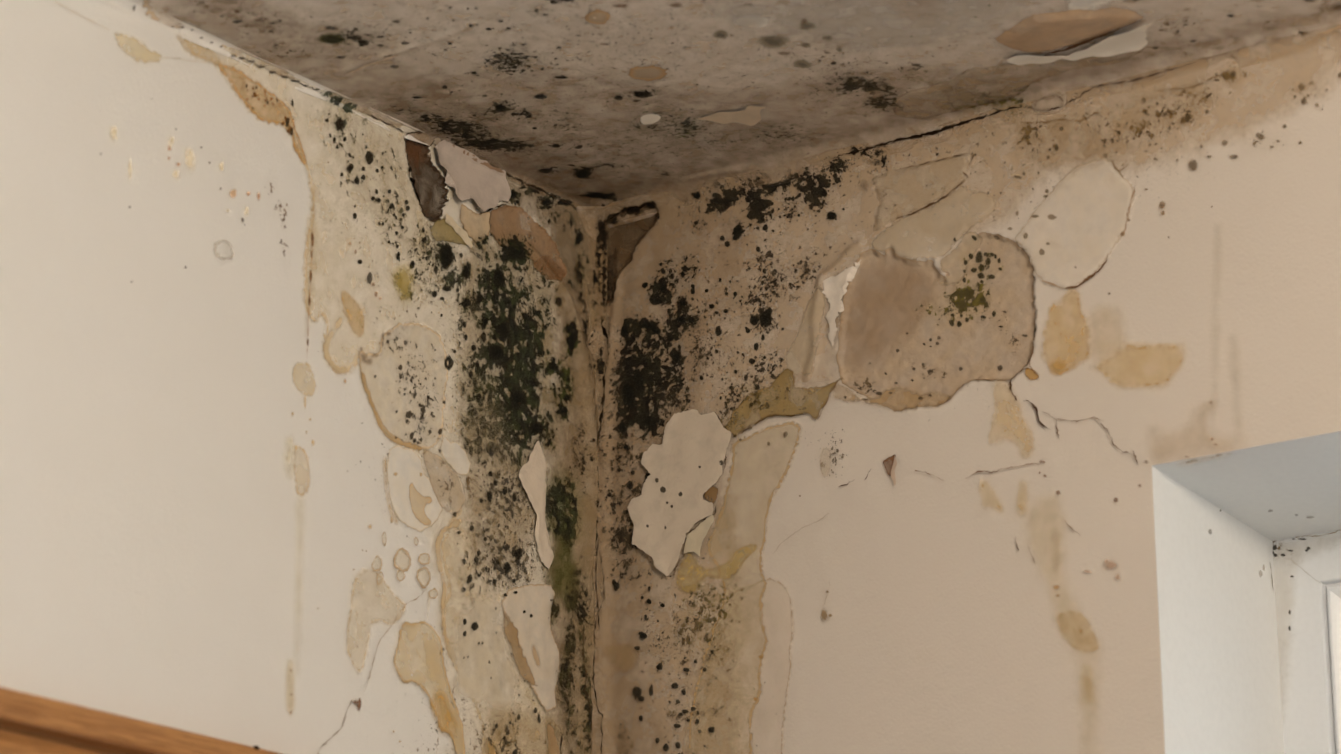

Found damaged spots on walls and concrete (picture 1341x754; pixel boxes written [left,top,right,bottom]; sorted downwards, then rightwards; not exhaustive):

crack [833,33,1300,159]
damp [932,10,1341,222]
spalling [404,131,567,281]
damp [916,236,1004,327]
damp [167,0,963,754]
spalling [627,232,1036,576]
crack [914,463,1038,481]
damp [1025,368,1039,380]
crack [1009,346,1148,465]
peeling [463,441,560,712]
damp [1259,538,1310,577]
crack [318,593,423,753]